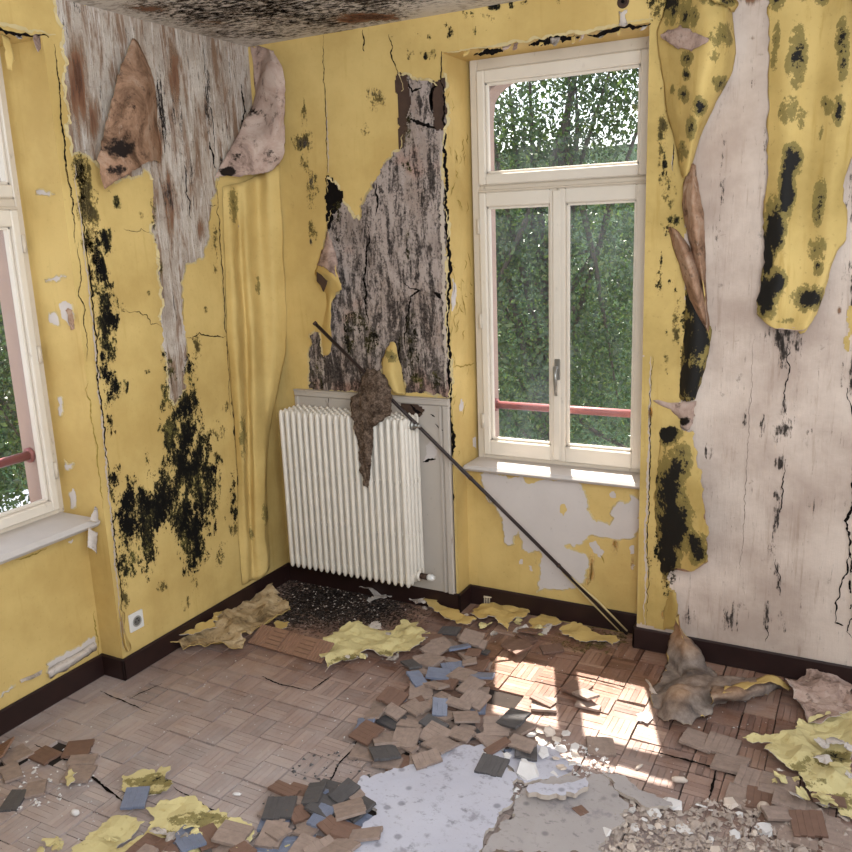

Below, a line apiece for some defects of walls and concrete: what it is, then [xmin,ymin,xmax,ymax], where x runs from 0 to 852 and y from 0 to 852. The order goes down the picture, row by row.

peeling [0,33,22,71]
water stain [129,0,435,39]
water stain [71,152,129,436]
flaking render [53,0,252,407]
flaking render [307,71,455,398]
water stain [658,110,683,236]
water stain [765,328,804,440]
water stain [108,337,238,606]
peeling [480,472,639,593]
water stain [768,455,788,593]
crack [834,482,852,638]
peeling [46,636,97,679]